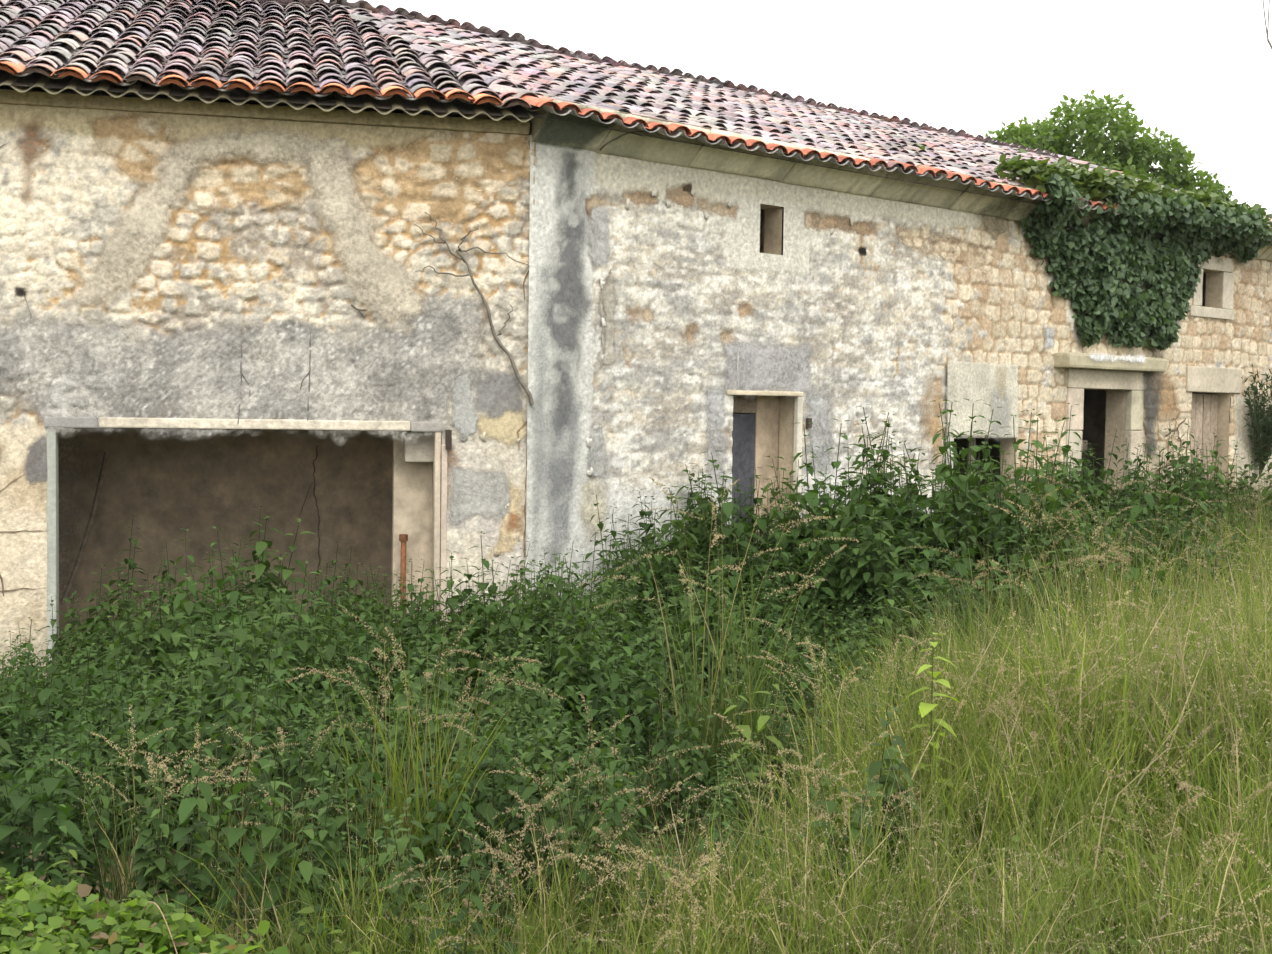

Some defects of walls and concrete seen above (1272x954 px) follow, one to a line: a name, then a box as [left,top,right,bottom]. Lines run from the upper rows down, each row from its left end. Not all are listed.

spalling [181,154,314,209]
spalling [352,118,536,224]
spalling [896,215,1008,273]
damp [476,155,590,561]